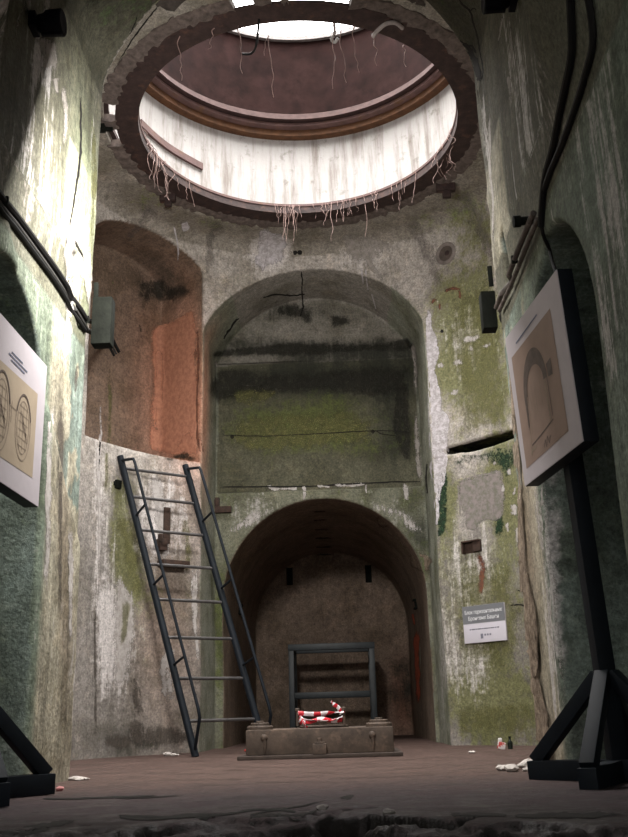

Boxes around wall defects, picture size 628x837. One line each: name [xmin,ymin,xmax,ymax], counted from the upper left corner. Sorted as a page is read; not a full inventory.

crack [263,272,305,315]
water stain [278,304,311,322]
water stain [210,311,449,525]
water stain [231,512,260,531]
corrosion [478,555,486,593]